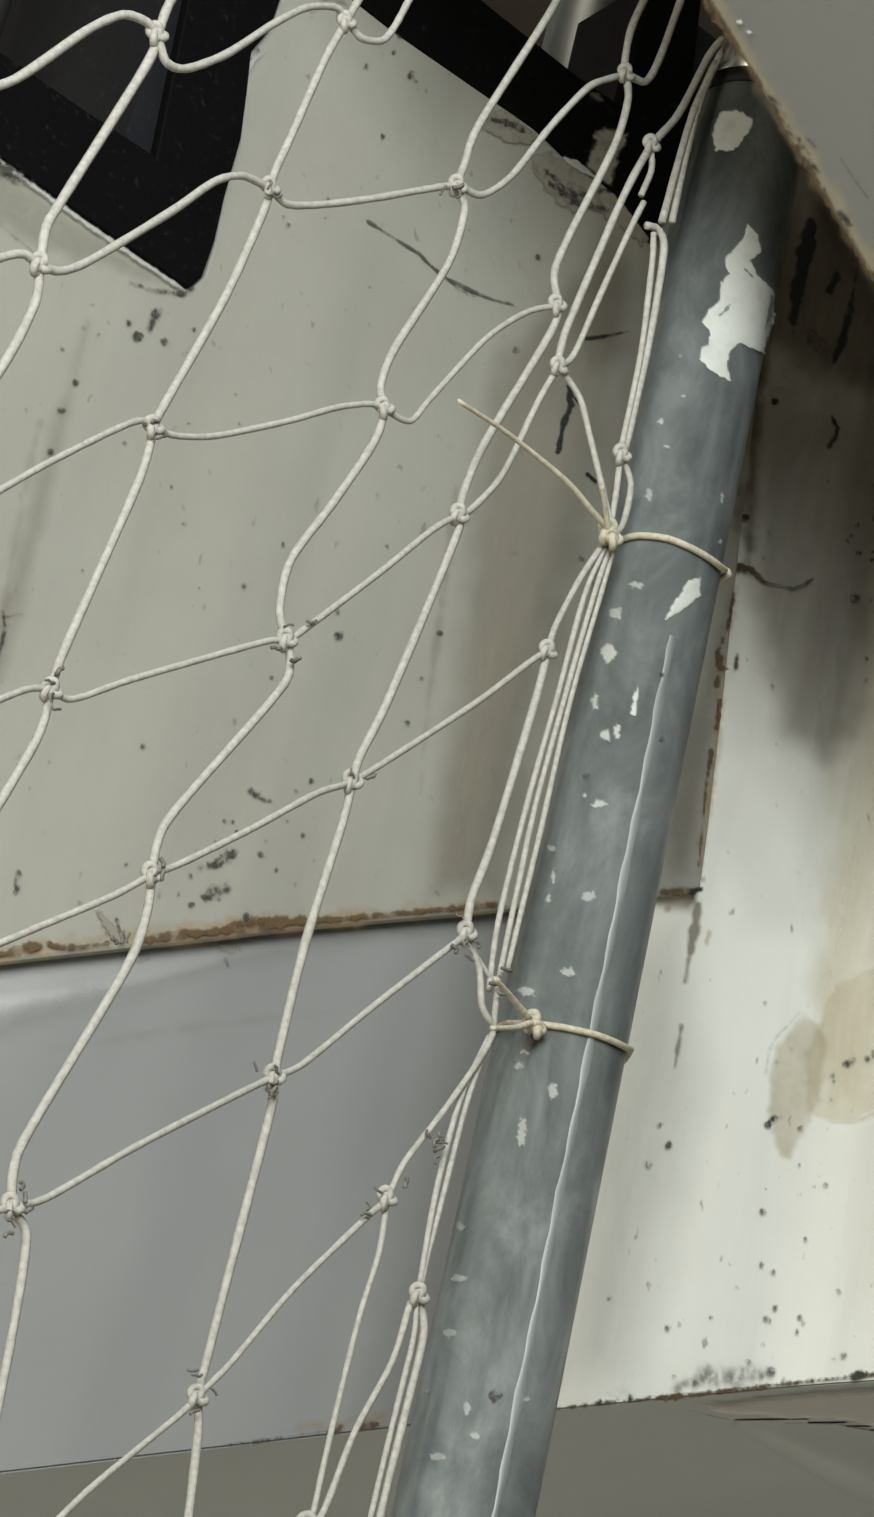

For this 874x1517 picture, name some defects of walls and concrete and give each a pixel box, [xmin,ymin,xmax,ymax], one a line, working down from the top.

crack [367,220,513,305]
water stain [768,96,874,372]
water stain [747,363,765,512]
crack [736,563,813,590]
corrosion [0,941,109,956]
corrosion [144,901,498,945]